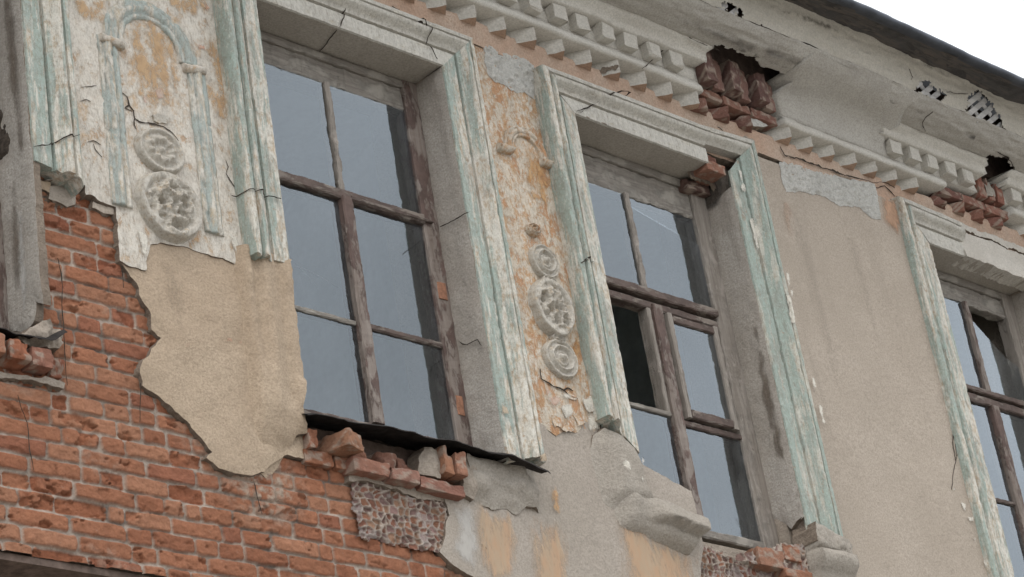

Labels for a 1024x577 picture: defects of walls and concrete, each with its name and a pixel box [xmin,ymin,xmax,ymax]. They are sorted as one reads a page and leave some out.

crack [320,8,346,51]
crack [123,93,179,141]
spalling [483,46,535,99]
spalling [690,52,778,142]
spalling [967,91,1002,128]
crack [34,134,102,157]
crack [226,161,281,199]
spalling [779,162,881,219]
crack [780,146,897,197]
spalling [928,177,1024,255]
spalling [0,176,464,577]
peeling [552,391,598,432]